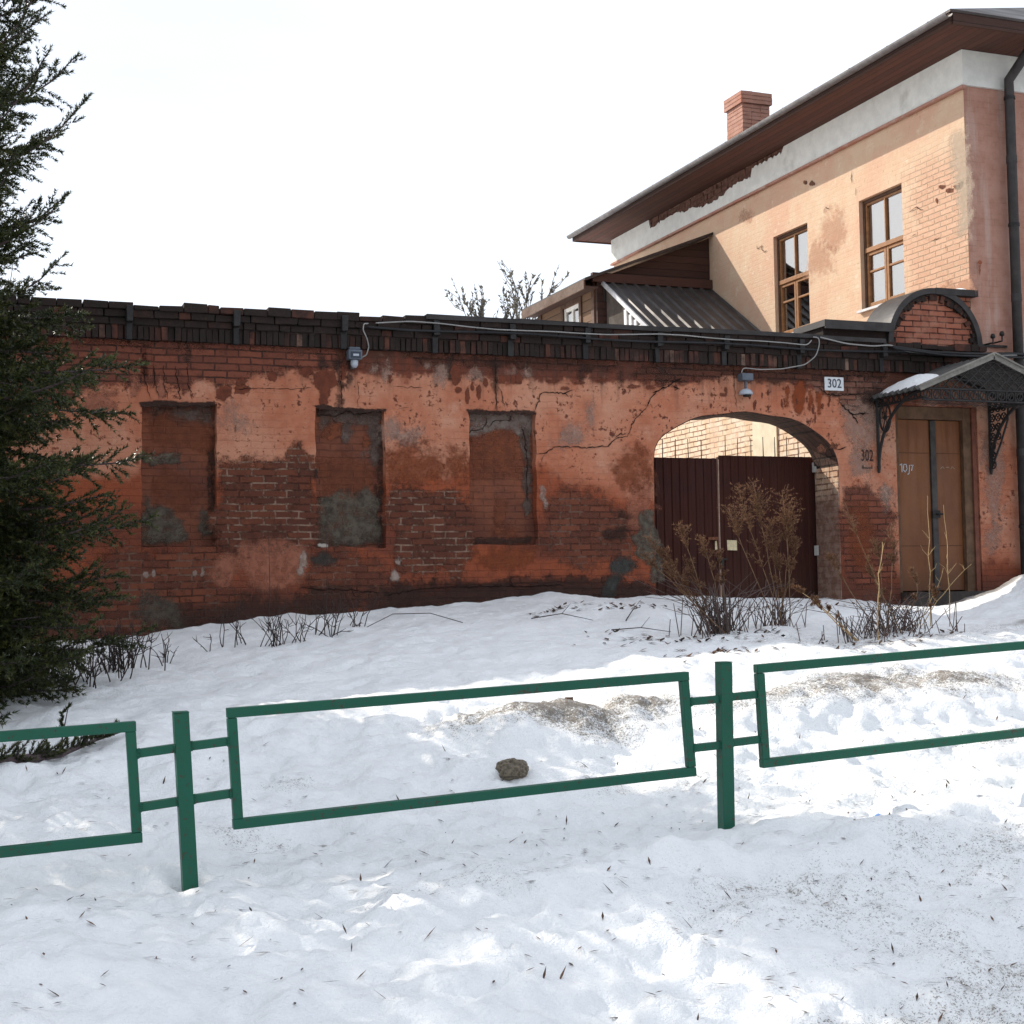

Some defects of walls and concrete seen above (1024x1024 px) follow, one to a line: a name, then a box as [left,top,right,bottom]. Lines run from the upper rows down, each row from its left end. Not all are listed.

flaking render [650,148,783,228]
flaking render [19,331,386,443]
crack [469,361,684,501]
flaking render [86,441,655,636]
flaking render [836,484,898,587]